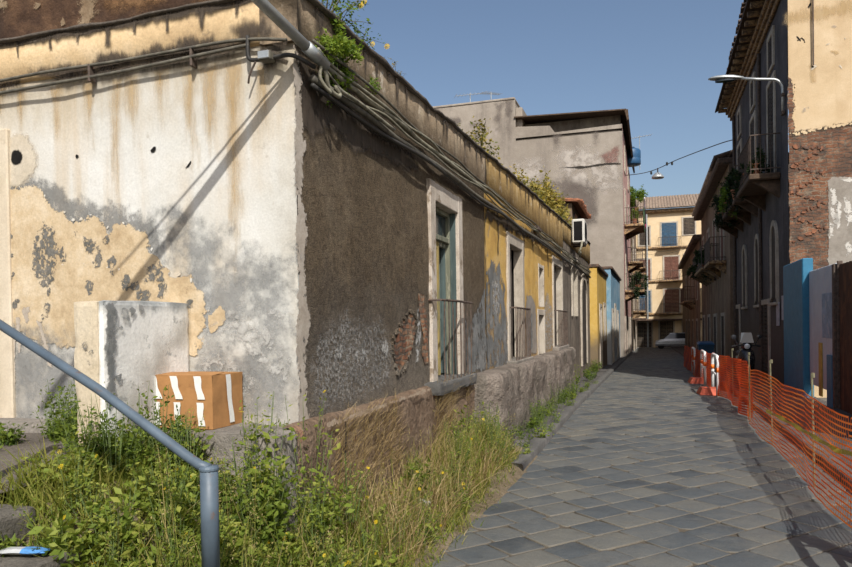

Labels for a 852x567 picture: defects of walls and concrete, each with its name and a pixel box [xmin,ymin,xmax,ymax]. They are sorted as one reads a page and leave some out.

peeling [105,0,160,8]
spalling [787,77,852,270]
peeling [10,134,226,408]
spalling [391,293,429,376]